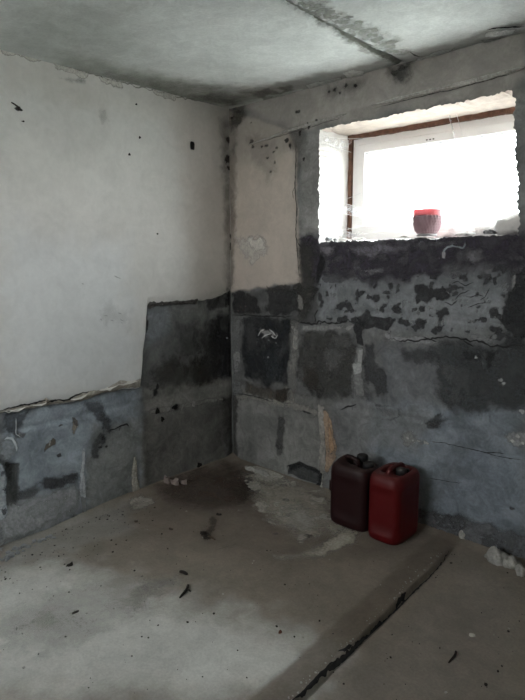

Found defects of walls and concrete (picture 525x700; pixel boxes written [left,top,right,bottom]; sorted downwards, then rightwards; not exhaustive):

peeling [146,299,198,333]
spalling [318,264,525,349]
crack [385,333,523,348]
peeling [0,379,141,413]
spalling [287,461,322,486]
crack [292,551,449,700]